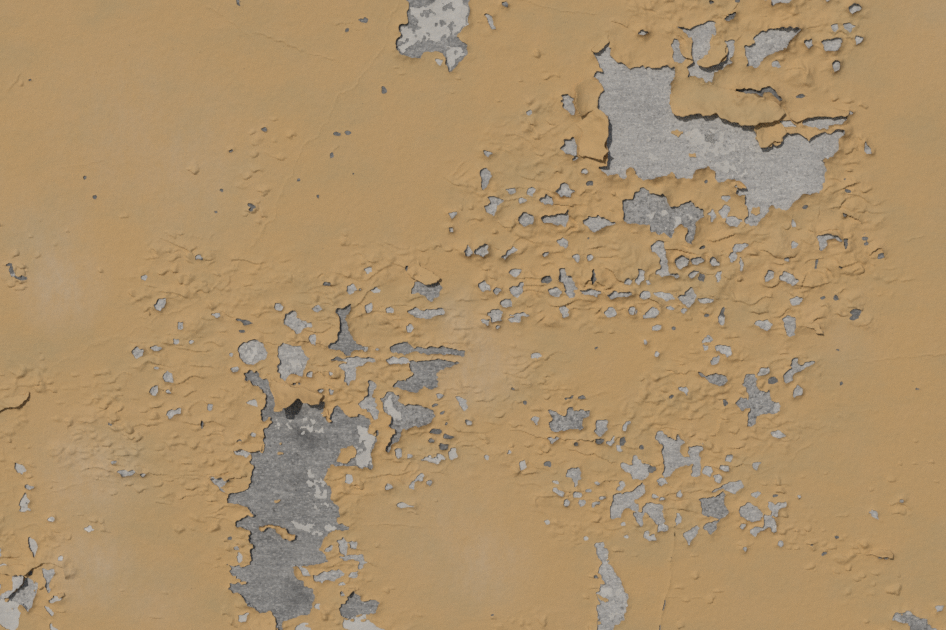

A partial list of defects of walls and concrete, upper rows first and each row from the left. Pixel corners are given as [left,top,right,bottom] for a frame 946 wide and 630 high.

peeling [386,0,514,80]
peeling [441,0,880,443]
peeling [206,259,477,630]
peeling [523,395,804,557]
peeling [0,533,72,630]
peeling [584,536,633,630]
peeling [888,602,946,630]